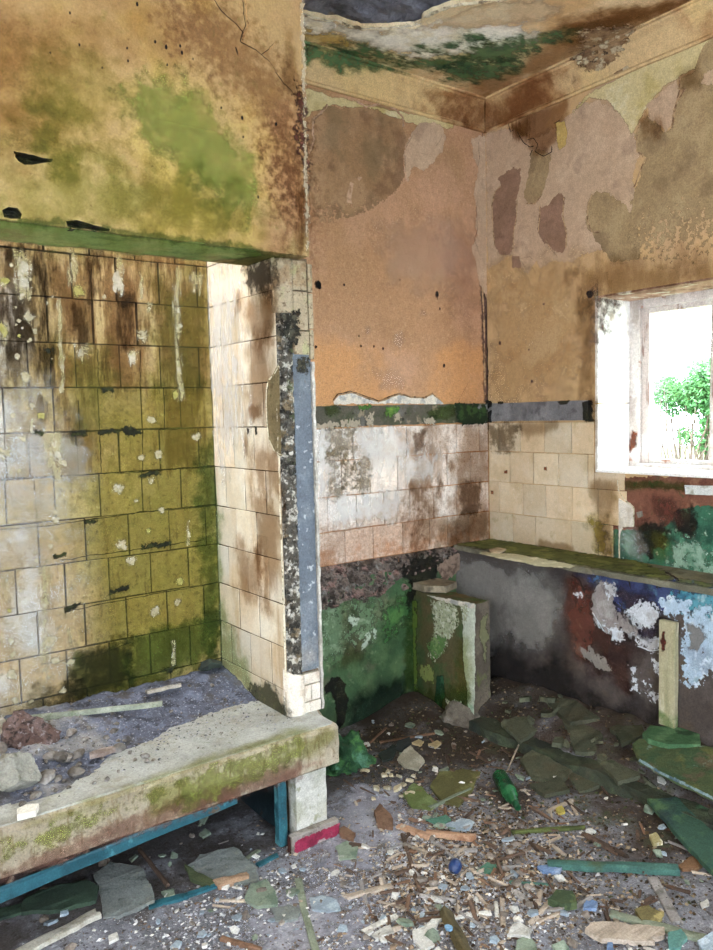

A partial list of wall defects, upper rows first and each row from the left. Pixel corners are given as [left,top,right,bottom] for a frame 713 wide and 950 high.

crack [214,0,296,99]
leakage [303,0,579,84]
peeling [300,0,451,249]
peeling [471,38,713,299]
flaking render [317,391,444,430]
leakage [325,428,372,499]
leakage [664,534,713,573]
peeling [573,580,713,703]